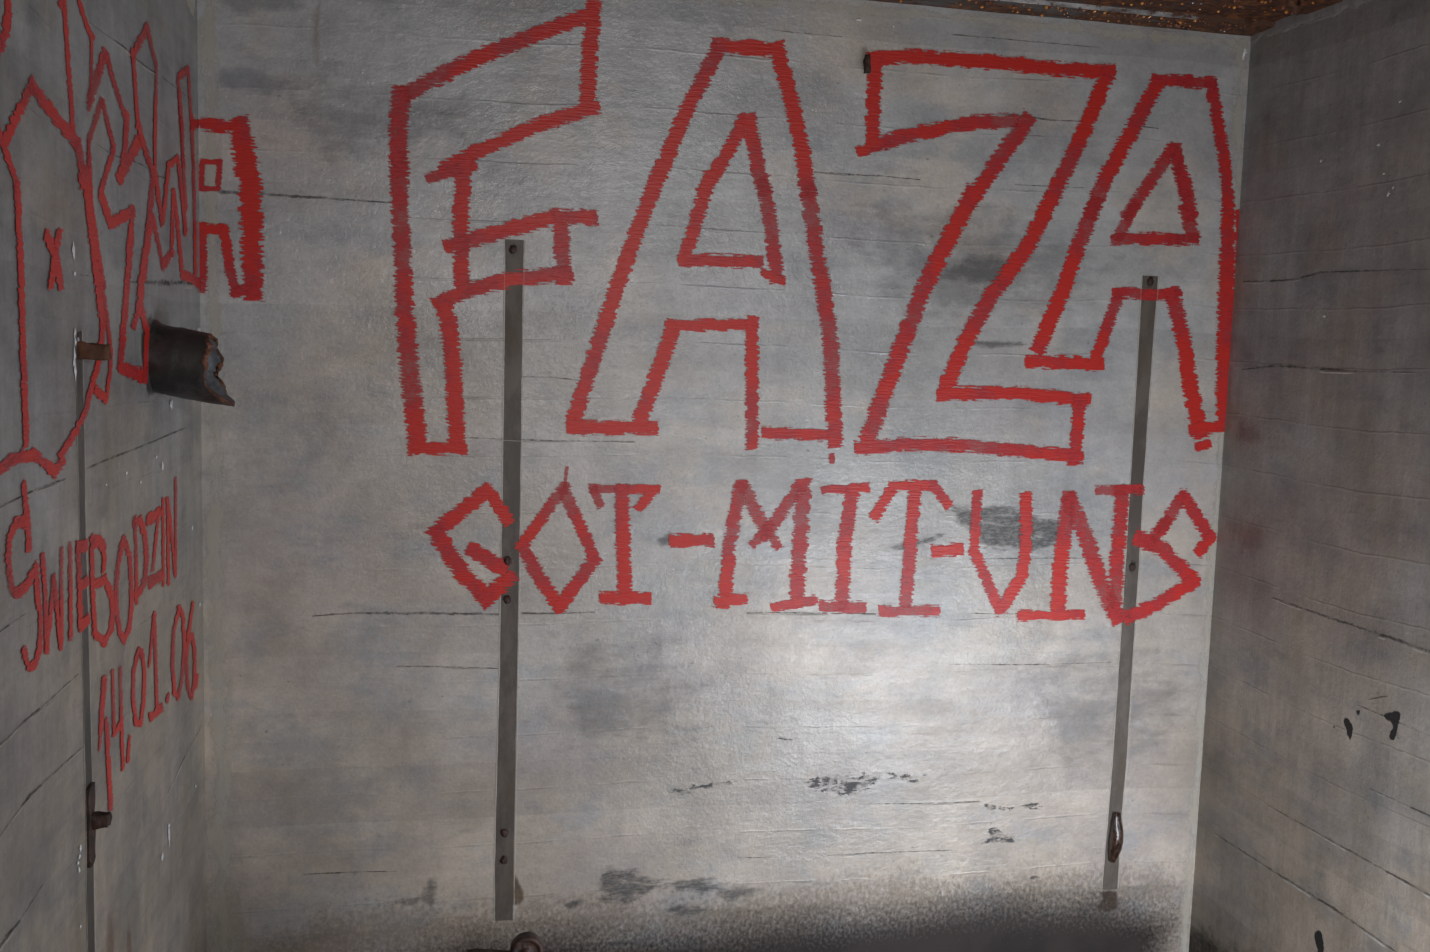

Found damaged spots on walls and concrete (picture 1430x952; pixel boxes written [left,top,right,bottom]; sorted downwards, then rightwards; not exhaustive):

damp [986,828,1014,843]
damp [602,871,654,901]
damp [674,880,745,898]
damp [529,897,1177,952]
damp [1189,933,1217,952]
damp [1314,930,1324,952]